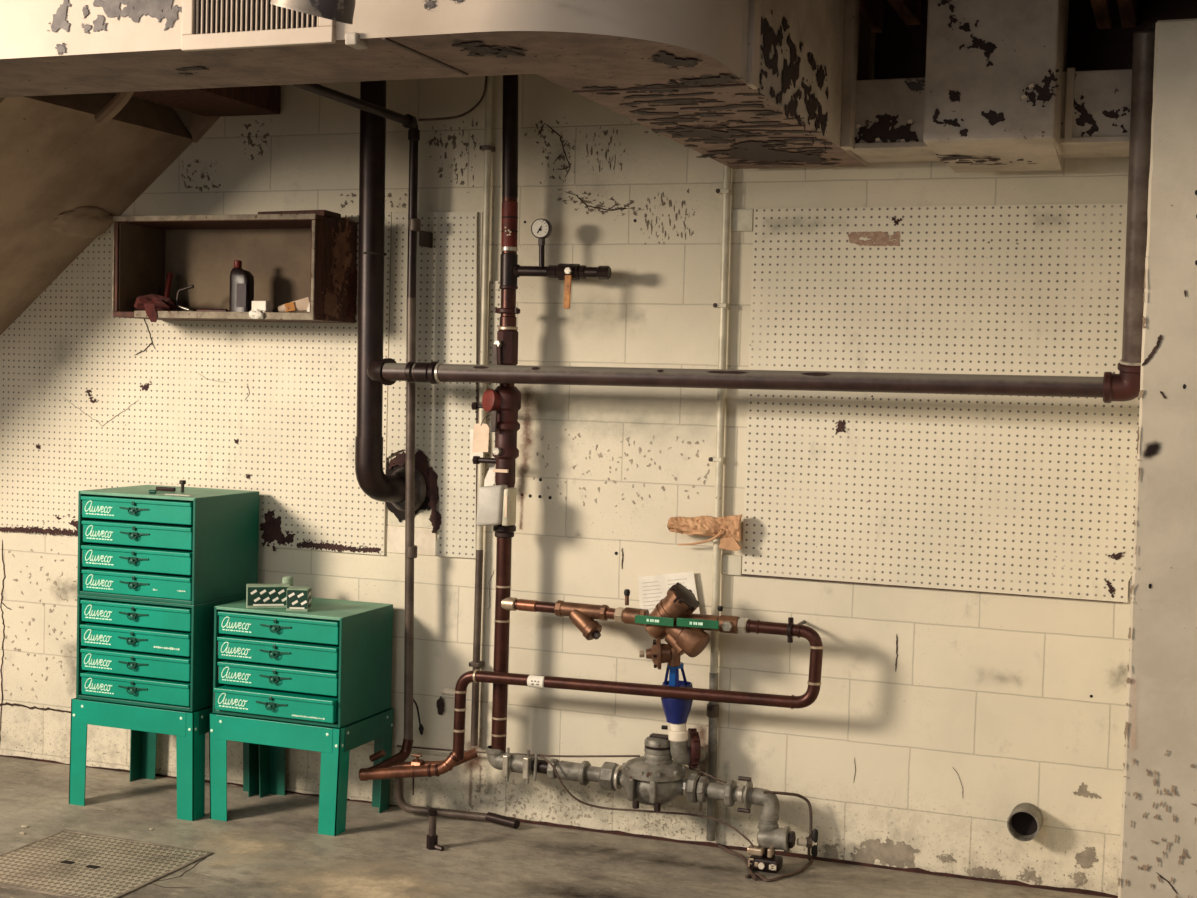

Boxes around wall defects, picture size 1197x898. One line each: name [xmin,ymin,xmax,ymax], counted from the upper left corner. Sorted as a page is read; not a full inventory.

peeling [47,0,182,55]
peeling [938,0,1003,67]
peeling [1021,69,1059,107]
peeling [524,10,841,244]
peeling [855,113,919,143]
peeling [933,90,968,137]
peeling [981,110,1006,131]
peeling [1074,95,1130,137]
spalling [386,450,441,533]
crack [0,540,71,741]
spalling [819,836,920,868]
spalling [1070,847,1098,889]